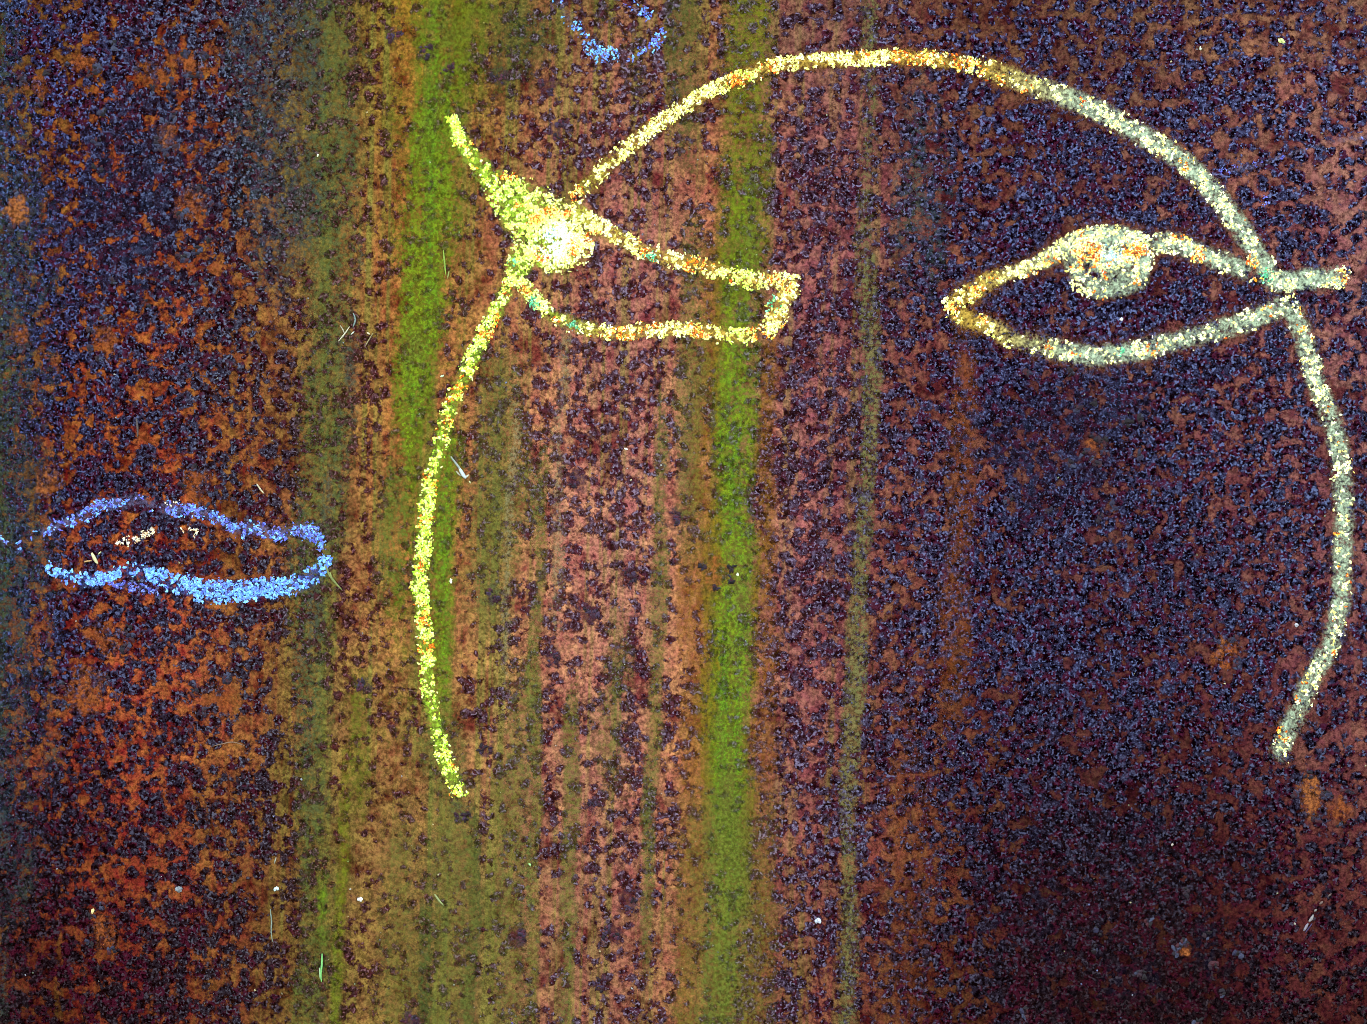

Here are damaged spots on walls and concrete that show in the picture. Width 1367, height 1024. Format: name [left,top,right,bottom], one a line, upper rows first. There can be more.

rust [17,55,103,106]
rust [133,49,209,94]
rust [3,188,36,234]
rust [173,183,216,287]
rust [698,556,737,591]
rust [86,624,136,654]
rust [543,650,561,668]
rust [58,667,110,719]
rust [476,741,493,757]
rust [1291,770,1358,828]
rust [84,901,117,955]
rust [1171,930,1213,958]